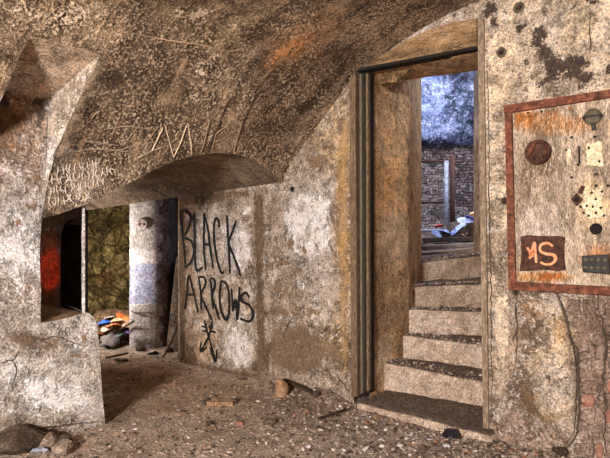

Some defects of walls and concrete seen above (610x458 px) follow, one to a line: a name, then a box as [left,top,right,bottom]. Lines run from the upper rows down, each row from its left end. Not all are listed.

flaking render [492,292,610,458]
crack [556,292,589,448]